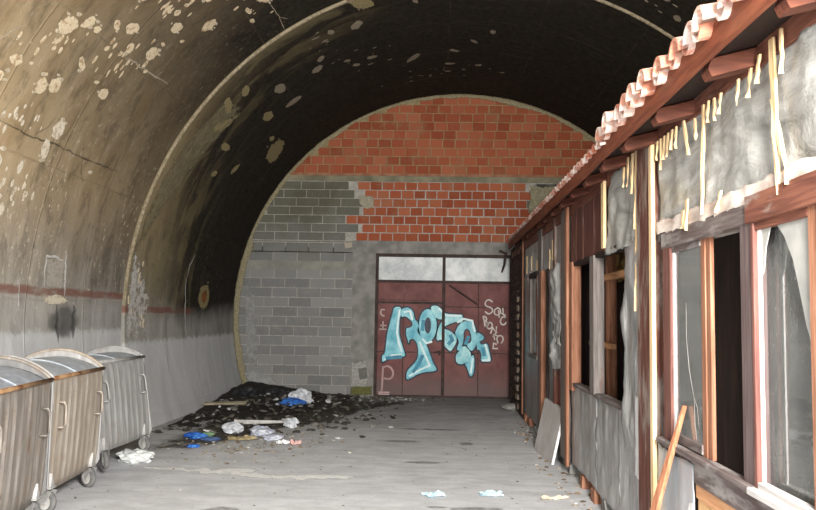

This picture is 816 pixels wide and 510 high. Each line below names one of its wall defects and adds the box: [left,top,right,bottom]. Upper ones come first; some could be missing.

spalling [347,0,374,30]
spalling [0,12,103,81]
peeling [78,20,165,100]
spalling [310,30,377,73]
peeling [0,72,63,133]
spalling [38,117,68,163]
spalling [266,136,285,163]
peeling [0,146,34,215]
damp [51,305,76,339]
flaking render [126,252,150,348]